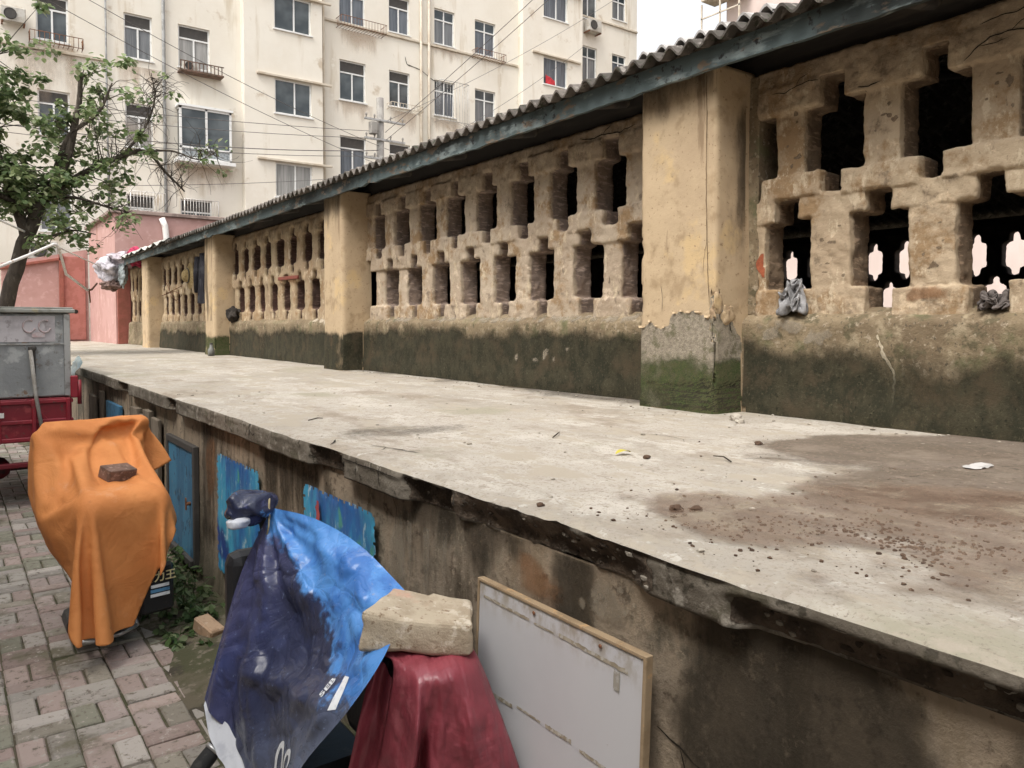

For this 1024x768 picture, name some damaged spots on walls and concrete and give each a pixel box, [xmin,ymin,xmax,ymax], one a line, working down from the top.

crack [702,82,710,295]
leakage [229,329,325,365]
leakage [362,327,641,402]
peeling [431,295,742,385]
crack [876,335,895,374]
leakage [742,341,1024,500]
spalling [403,474,653,593]
leakage [553,553,621,627]
leakage [677,616,936,768]